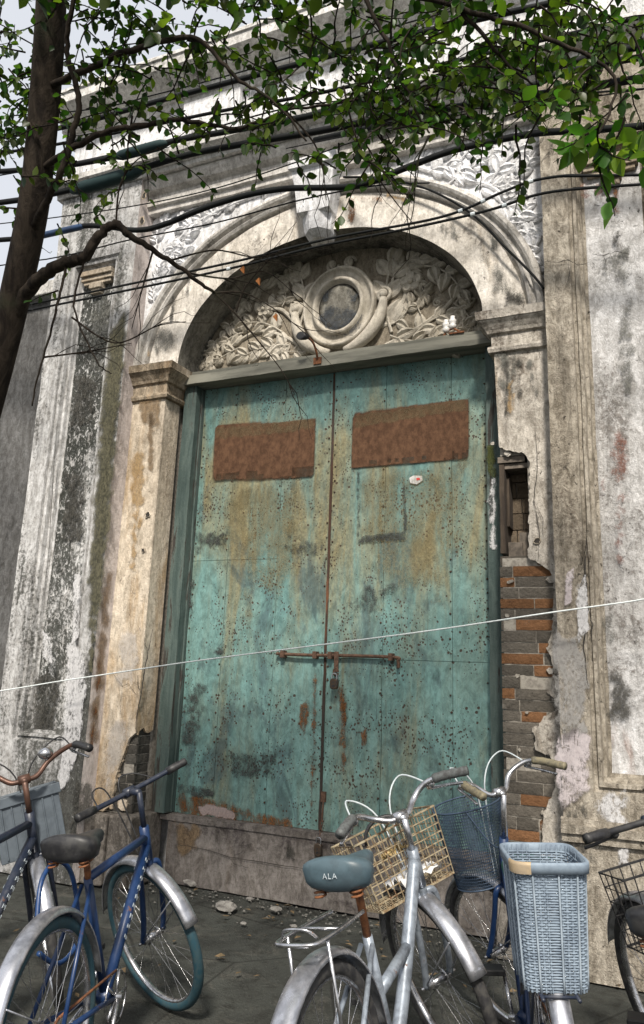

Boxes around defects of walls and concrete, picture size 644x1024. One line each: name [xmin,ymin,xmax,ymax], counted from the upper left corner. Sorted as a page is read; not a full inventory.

water stain [600,221,629,280]
water stain [618,297,635,393]
water stain [62,472,84,542]
water stain [130,400,159,568]
rust [213,418,316,480]
rust [351,399,469,468]
water stain [90,573,112,745]
flaking render [487,442,591,842]
water stain [32,673,60,731]
flaking render [101,729,150,814]
rust [299,678,317,744]
rust [338,687,347,772]